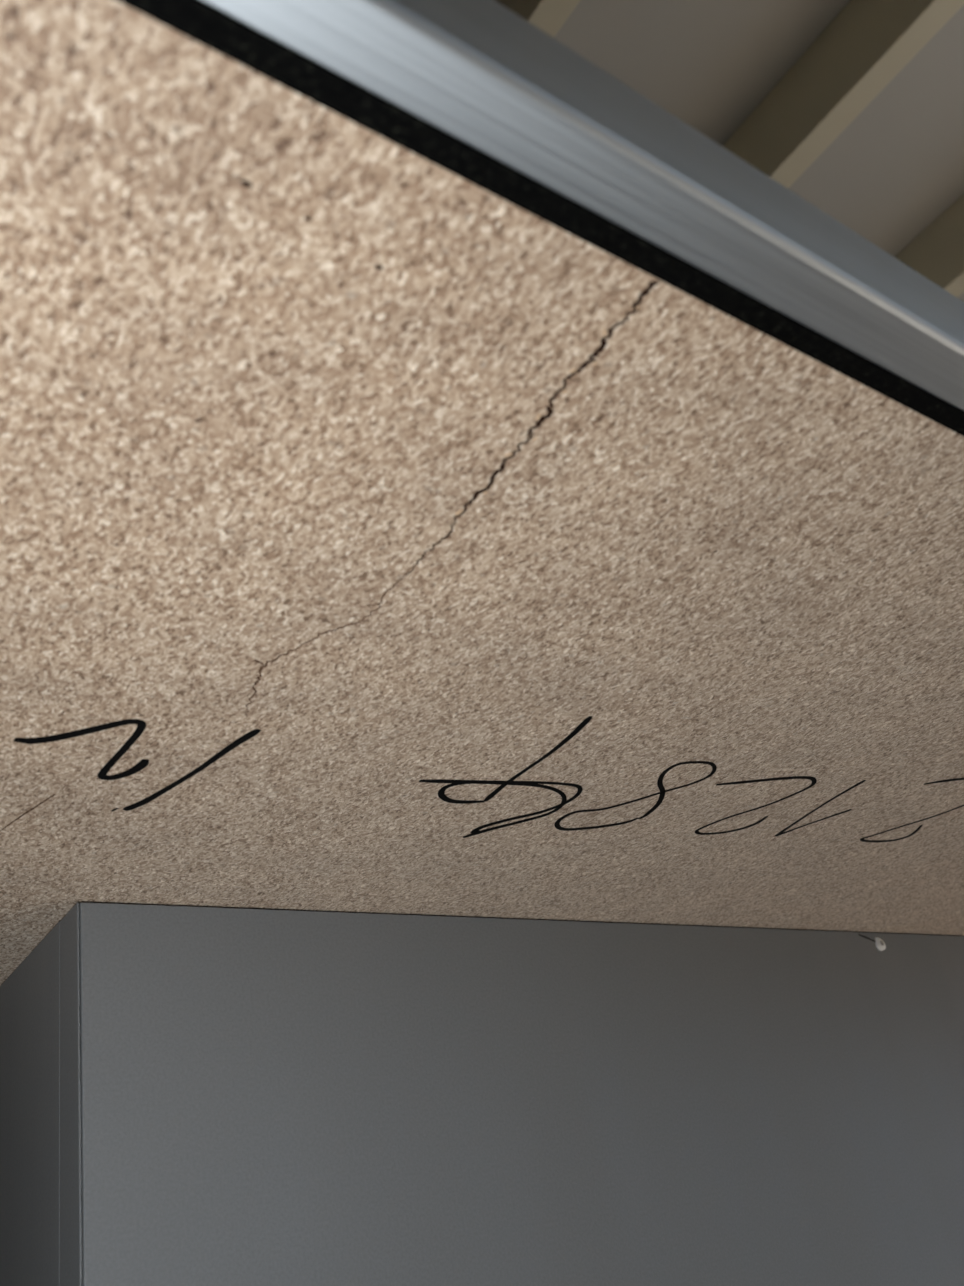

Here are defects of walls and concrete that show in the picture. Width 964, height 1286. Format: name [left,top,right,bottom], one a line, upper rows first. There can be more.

crack [246,281,659,709]